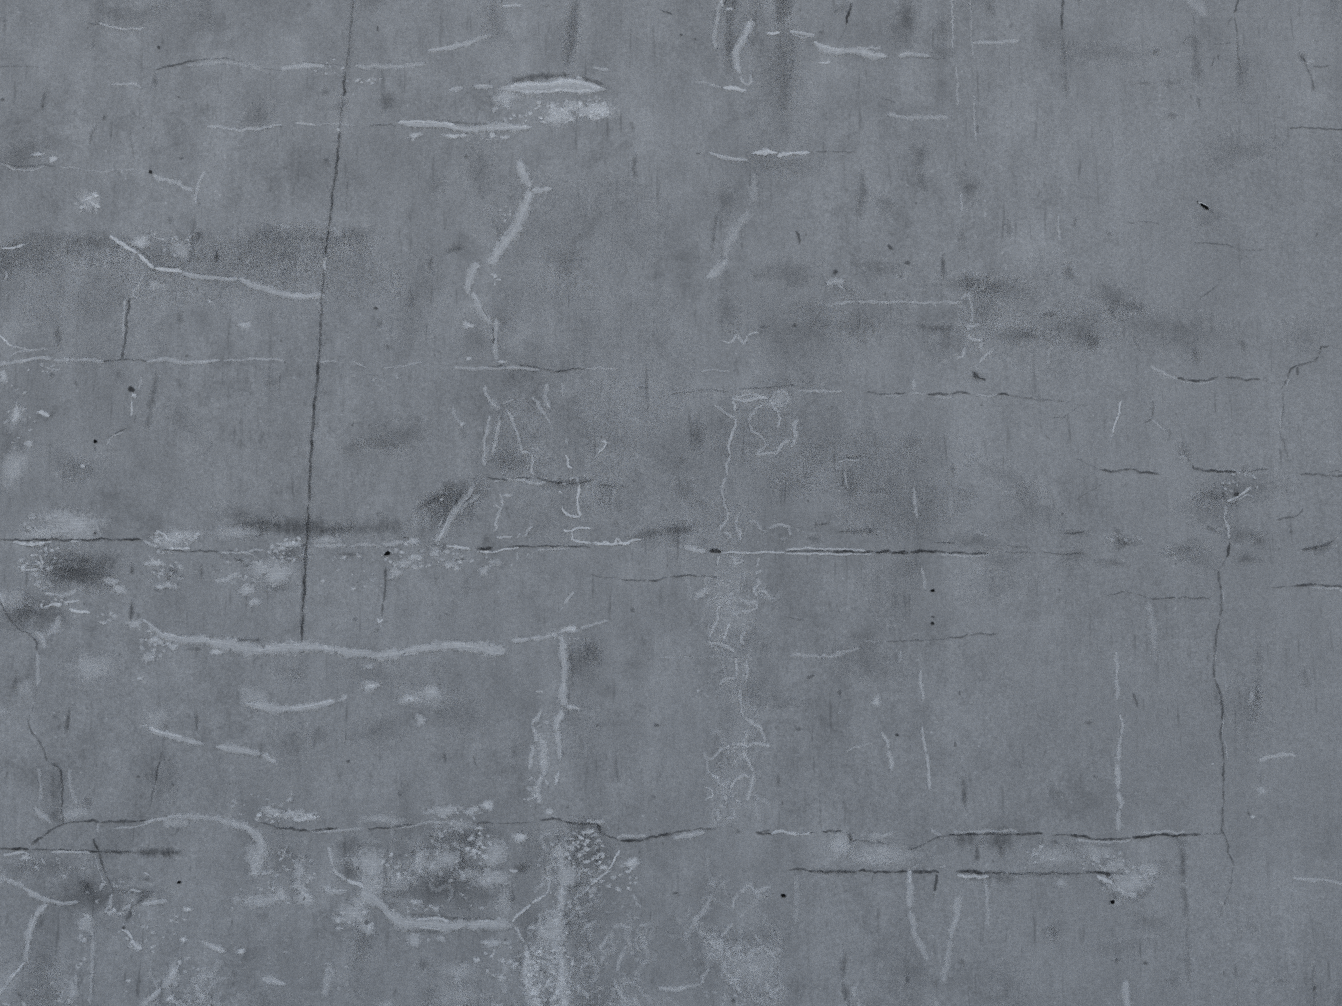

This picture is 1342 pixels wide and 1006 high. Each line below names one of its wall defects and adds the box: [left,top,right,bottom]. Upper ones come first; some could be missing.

crack [282,64,346,94]
crack [310,361,319,453]
crack [15,537,210,552]
crack [447,539,640,553]
crack [686,547,721,576]
crack [834,548,987,556]
crack [543,817,704,842]
crack [949,830,1222,840]
crack [756,830,996,891]